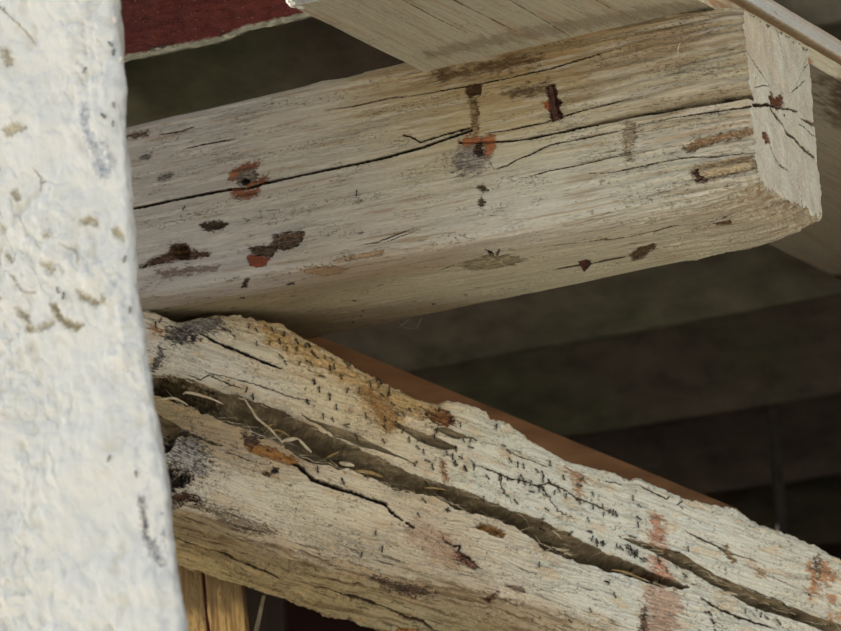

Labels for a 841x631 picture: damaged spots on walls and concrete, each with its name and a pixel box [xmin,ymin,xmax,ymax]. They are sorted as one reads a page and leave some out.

crack [133,48,814,210]
rust [461,134,497,157]
rust [227,161,269,200]
rust [247,255,270,268]
crack [200,328,281,369]
crack [152,371,841,631]